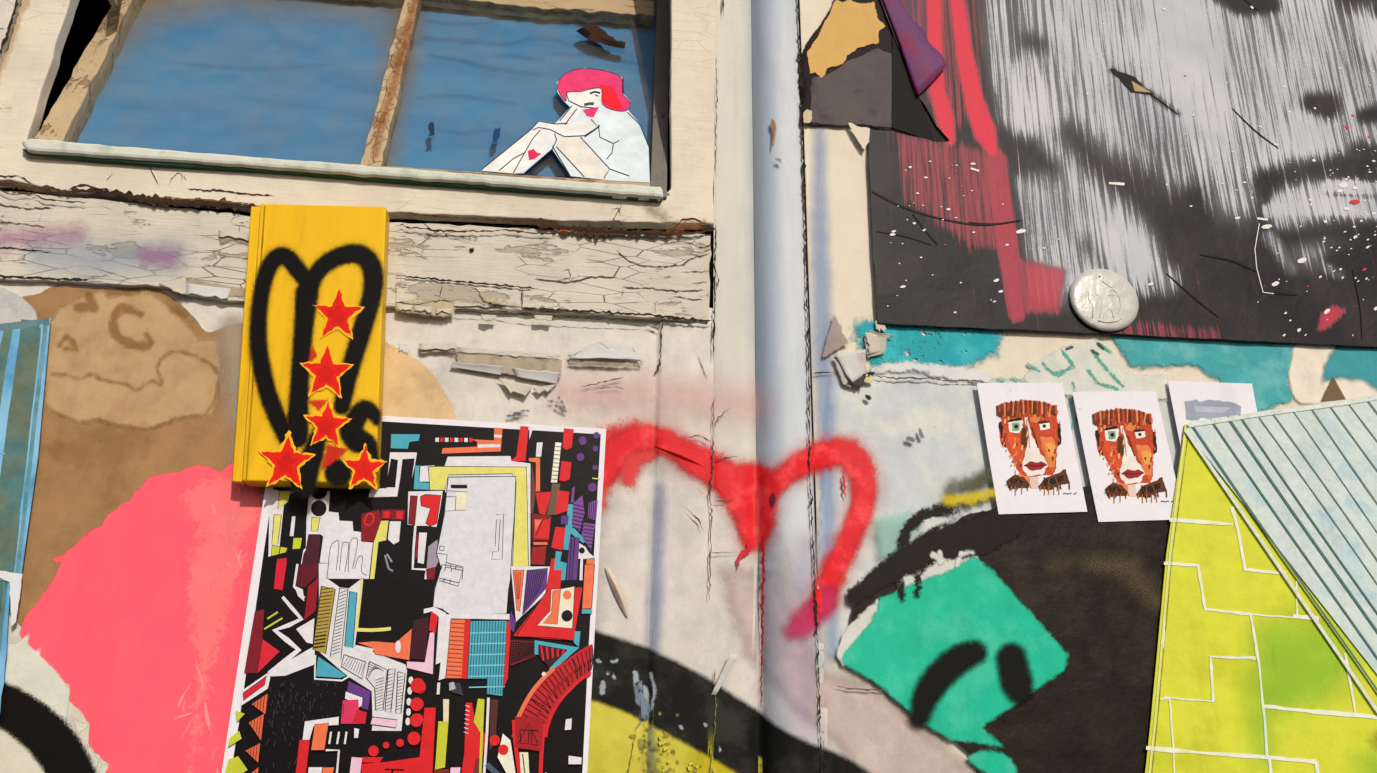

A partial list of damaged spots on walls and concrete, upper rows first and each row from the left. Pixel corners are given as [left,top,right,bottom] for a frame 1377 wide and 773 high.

rust [375,0,416,155]
peeling [218,230,249,245]
peeling [158,276,245,299]
peeling [396,300,455,317]
peeling [480,293,518,321]
peeling [399,342,643,417]